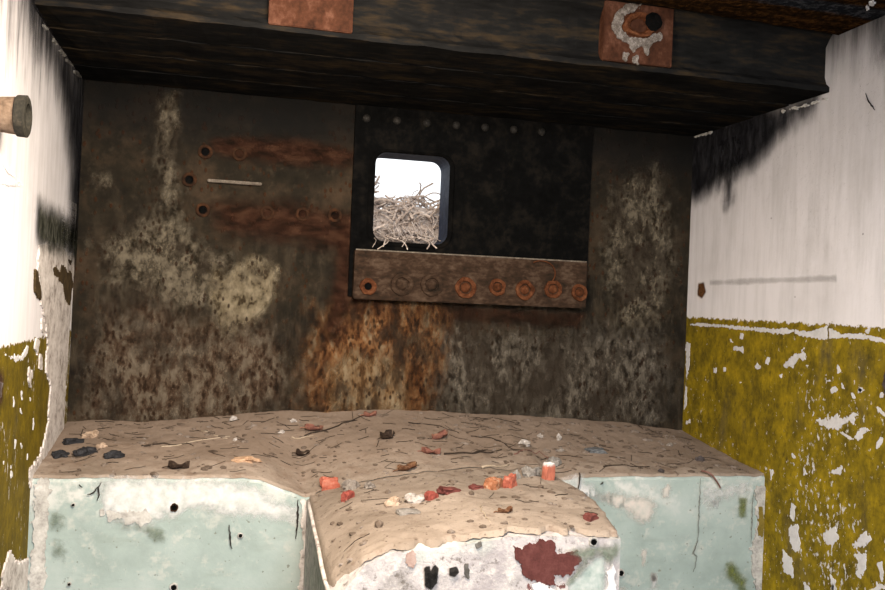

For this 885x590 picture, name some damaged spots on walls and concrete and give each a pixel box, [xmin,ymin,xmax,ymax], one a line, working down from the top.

peeling [611,3,663,65]
leakage [38,199,78,260]
corrosion [304,218,583,413]
peeling [690,323,885,353]
peeling [779,348,808,378]
peeling [0,243,75,590]
peeling [816,412,870,441]
peeling [513,539,624,590]
peeling [704,469,774,590]
peeling [782,503,810,590]
peeling [823,527,839,546]
peeling [852,529,885,590]